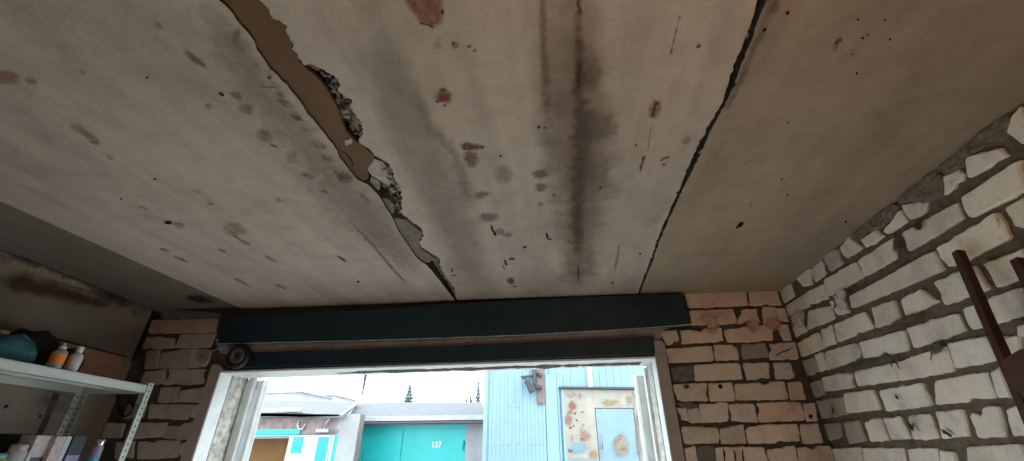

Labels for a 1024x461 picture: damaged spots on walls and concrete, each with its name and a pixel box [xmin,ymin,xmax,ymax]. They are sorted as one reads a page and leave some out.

peeling [407,0,444,27]
spalling [306,64,363,137]
corrosion [436,89,451,107]
damp [554,29,599,281]
spalling [380,167,404,216]
damp [3,257,128,307]